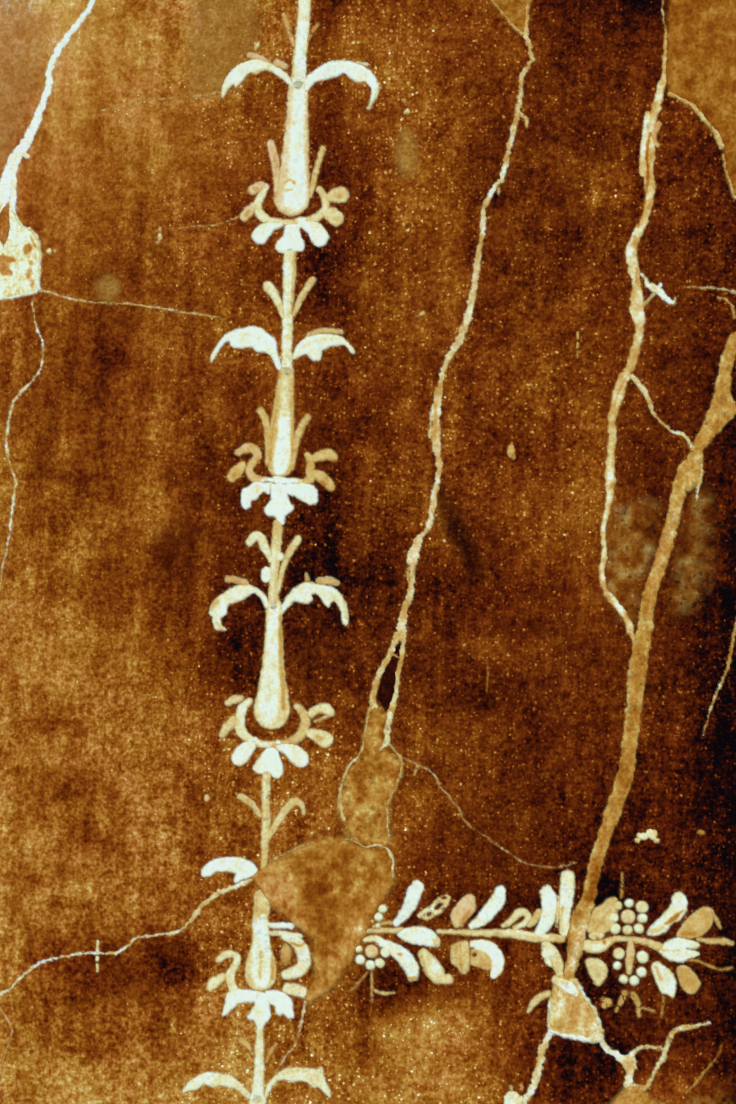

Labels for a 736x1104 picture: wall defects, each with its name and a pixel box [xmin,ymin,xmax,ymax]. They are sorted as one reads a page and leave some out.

crack [0,0,96,214]
crack [102,91,223,111]
peeling [0,202,10,244]
crack [172,216,240,229]
crack [369,12,535,716]
crack [0,290,221,589]
crack [414,0,736,979]
crack [0,879,253,1077]
crack [523,1030,554,1104]
peeling [613,1086,664,1104]
crack [600,1022,722,1094]